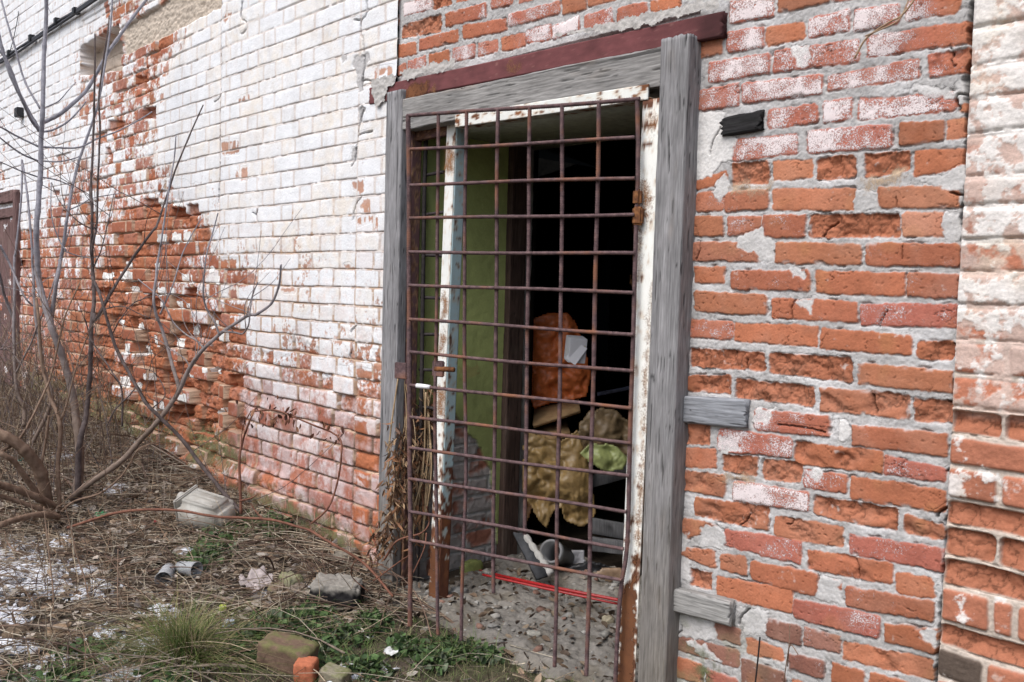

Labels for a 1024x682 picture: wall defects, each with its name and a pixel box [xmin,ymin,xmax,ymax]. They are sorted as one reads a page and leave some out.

crack [350,0,374,169]
rust [444,145,457,171]
spalling [730,159,772,187]
spalling [815,149,914,182]
peeling [963,21,1024,307]
crack [352,194,364,222]
spalling [808,211,903,241]
spalling [19,0,381,547]
crack [877,306,891,329]
crack [348,323,357,367]
rust [617,555,638,682]